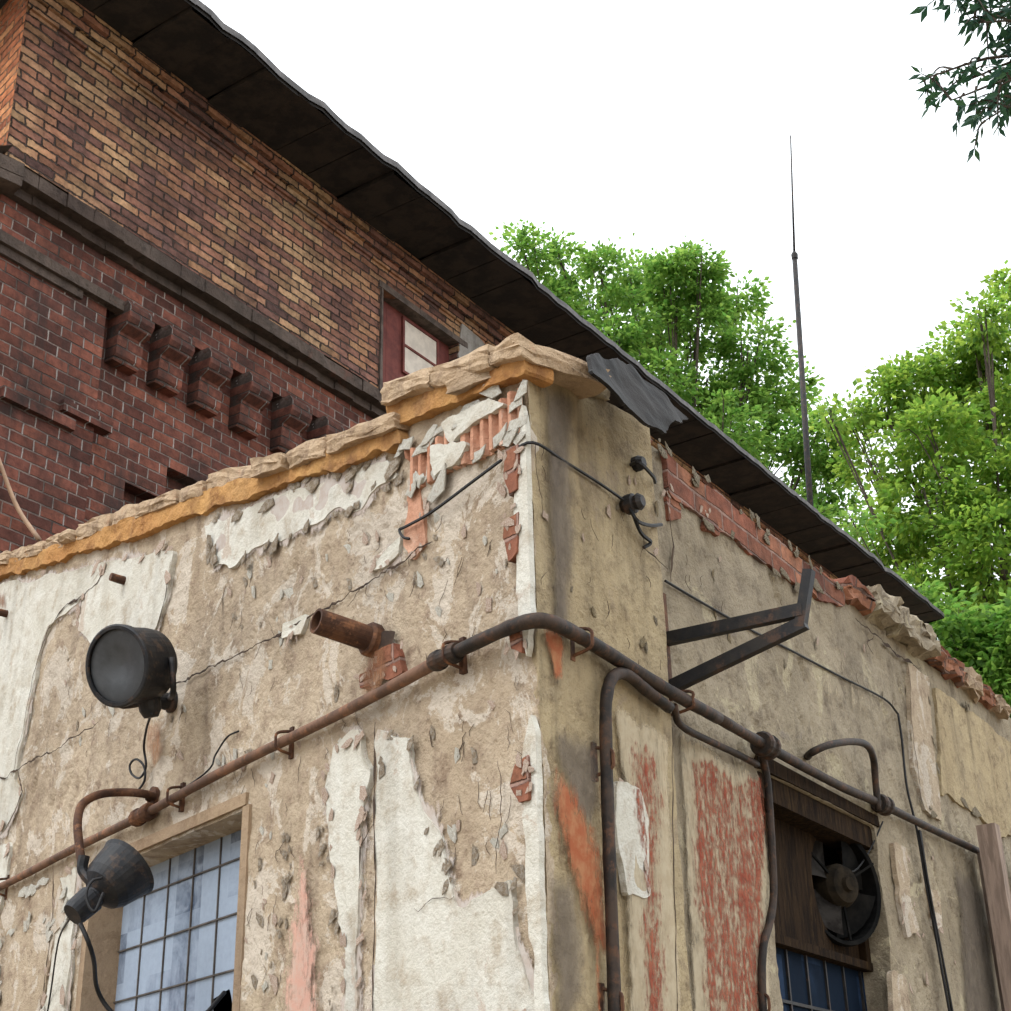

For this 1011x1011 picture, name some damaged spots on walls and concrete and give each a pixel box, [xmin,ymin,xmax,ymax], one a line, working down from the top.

crack [0,571,106,829]
peeling [0,540,177,1011]
peeling [244,826,319,1011]
peeling [259,614,310,646]
peeling [205,380,528,617]
peeling [316,700,535,1011]
rust [556,776,606,1010]
peeling [613,710,680,1011]
spalling [651,438,845,607]
peeling [889,842,962,941]
peeling [905,664,1011,838]